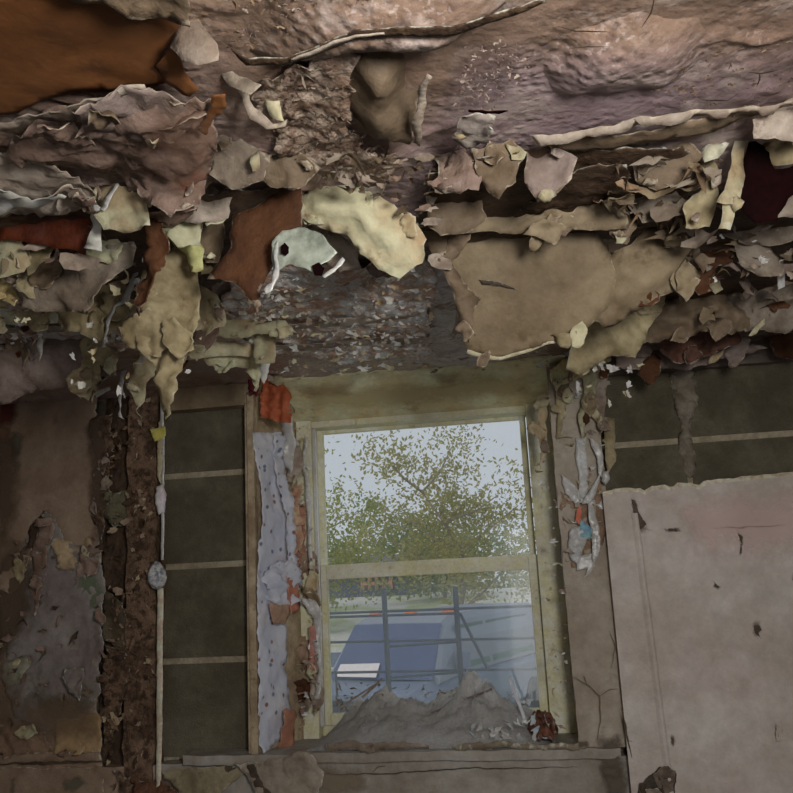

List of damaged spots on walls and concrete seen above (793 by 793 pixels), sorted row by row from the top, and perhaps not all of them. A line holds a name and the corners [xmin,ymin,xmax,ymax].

peeling [0,0,317,132]
peeling [0,208,146,318]
peeling [184,39,793,381]
peeling [0,298,84,358]
spalling [0,397,325,793]
crack [574,675,613,740]
crack [620,707,632,757]
spalling [638,766,677,793]